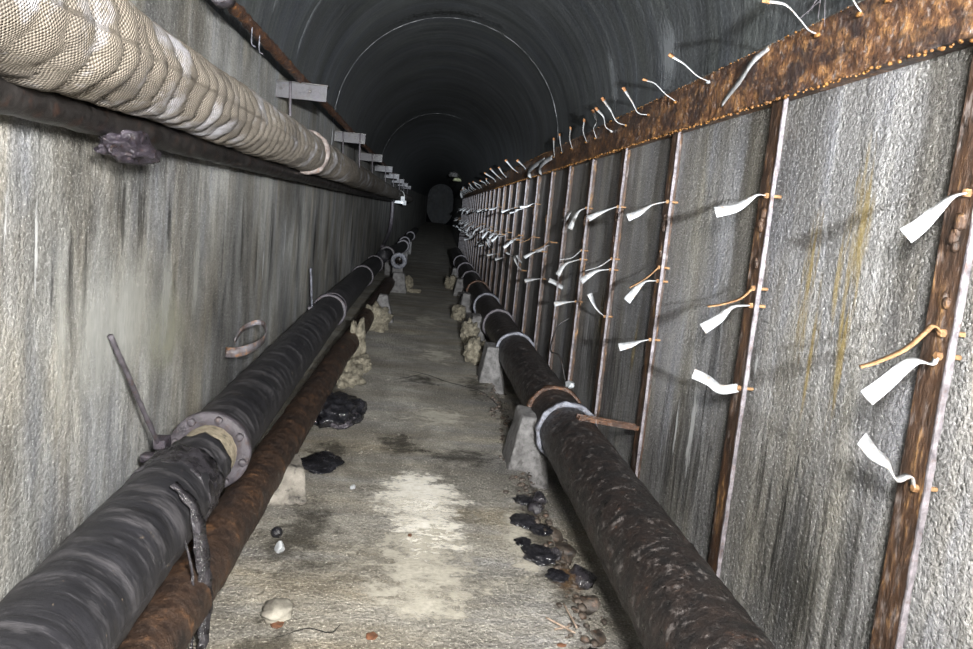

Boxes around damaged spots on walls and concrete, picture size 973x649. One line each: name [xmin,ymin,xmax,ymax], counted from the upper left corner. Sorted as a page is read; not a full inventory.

corrosion [833,183,871,409]
damp [268,503,338,560]
damp [237,632,290,649]